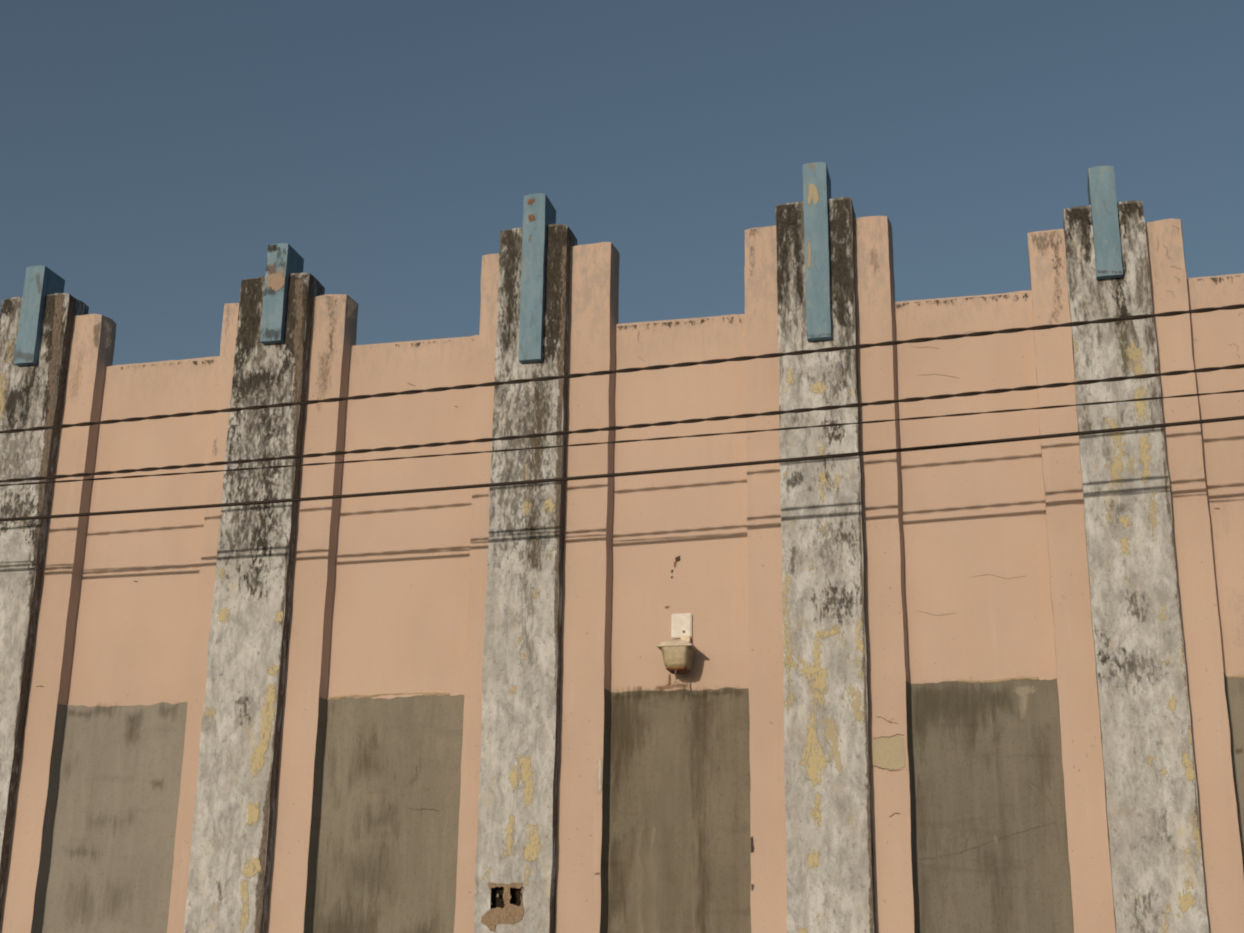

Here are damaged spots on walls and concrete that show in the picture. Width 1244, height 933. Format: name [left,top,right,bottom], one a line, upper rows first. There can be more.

water stain [0,294,65,430]
water stain [220,260,308,599]
water stain [495,230,522,360]
water stain [776,204,804,314]
water stain [828,199,854,334]
water stain [1032,208,1132,376]
peeling [1105,229,1176,568]
spalling [239,278,304,933]
peeling [782,417,874,933]
peeling [1159,584,1201,860]
spalling [481,755,542,932]
peeling [1162,880,1196,933]